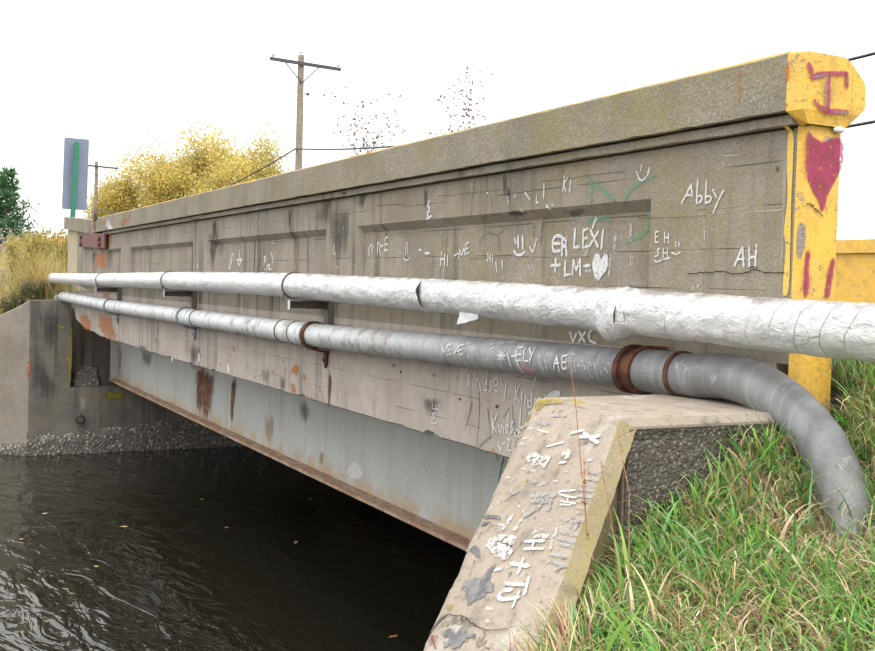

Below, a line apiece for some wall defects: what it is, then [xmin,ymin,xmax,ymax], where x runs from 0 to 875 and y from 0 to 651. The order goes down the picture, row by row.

crack [687,266,784,275]
rust [80,313,121,370]
rust [196,367,213,418]
rust [283,361,331,405]
crack [435,614,513,650]